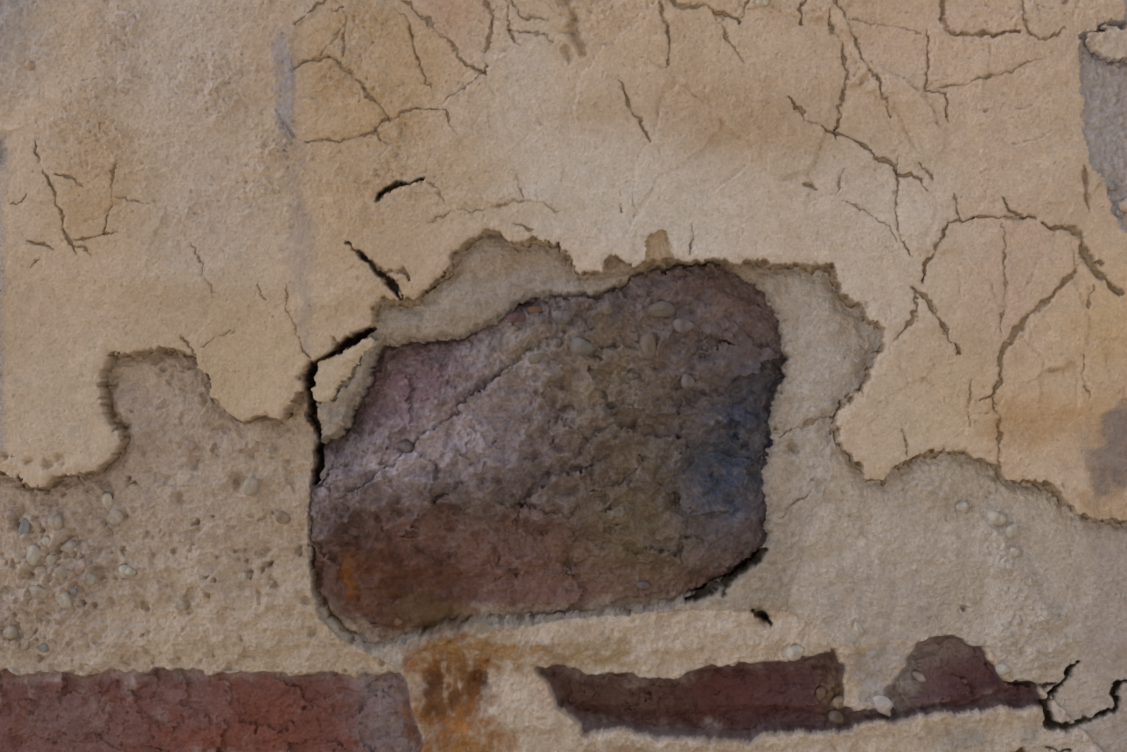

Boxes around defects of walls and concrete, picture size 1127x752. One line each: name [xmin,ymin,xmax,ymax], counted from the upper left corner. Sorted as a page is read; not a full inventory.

crack [403,0,534,89]
crack [659,0,749,65]
crack [790,0,933,186]
crack [924,0,1058,118]
crack [11,145,136,263]
crack [376,178,446,217]
crack [347,242,443,302]
crack [904,199,1124,444]
crack [299,328,376,485]
spalling [0,230,1127,752]
rust [406,634,550,752]
crack [1005,660,1127,751]